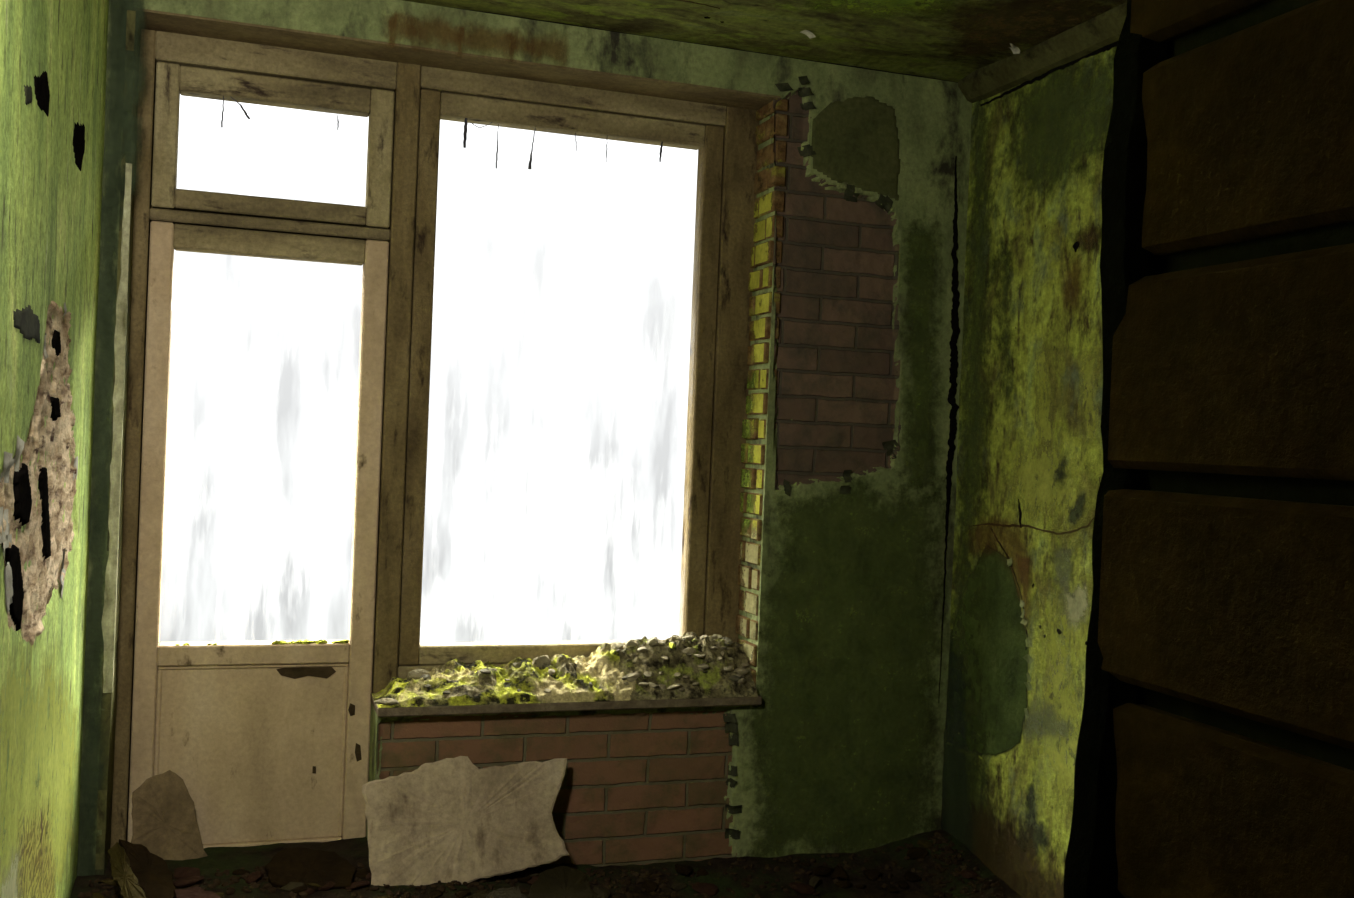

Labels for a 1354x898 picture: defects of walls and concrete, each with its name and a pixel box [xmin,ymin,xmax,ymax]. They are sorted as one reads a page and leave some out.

water stain [389,16,565,58]
water stain [923,0,1125,61]
flaking render [0,301,78,646]
water stain [941,47,1117,898]